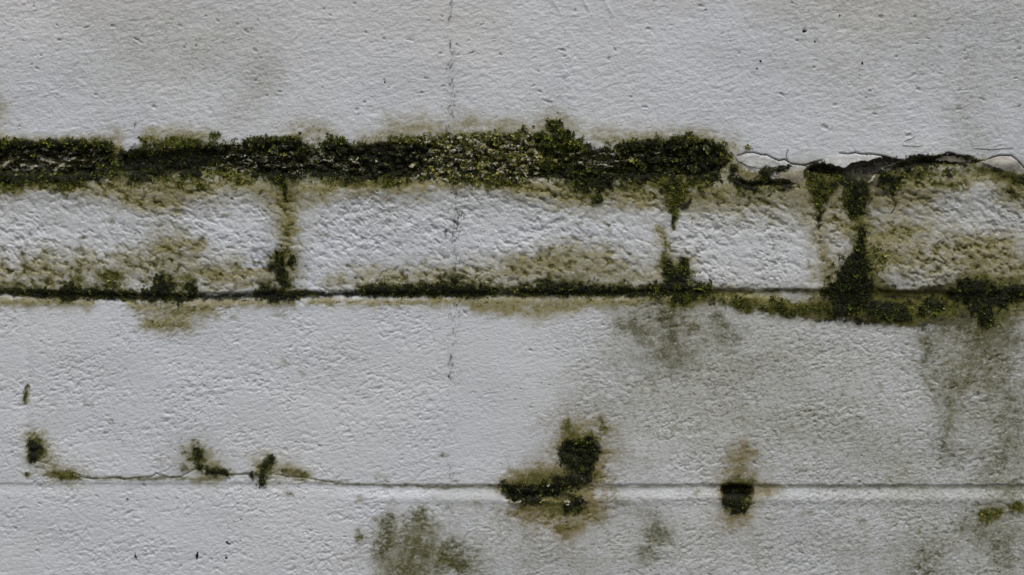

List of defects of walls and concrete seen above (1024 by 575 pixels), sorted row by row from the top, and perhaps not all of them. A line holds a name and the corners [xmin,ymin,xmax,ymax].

leakage [362,40,664,166]
crack [738,136,1024,168]
leakage [0,131,1024,475]
leakage [256,461,311,478]